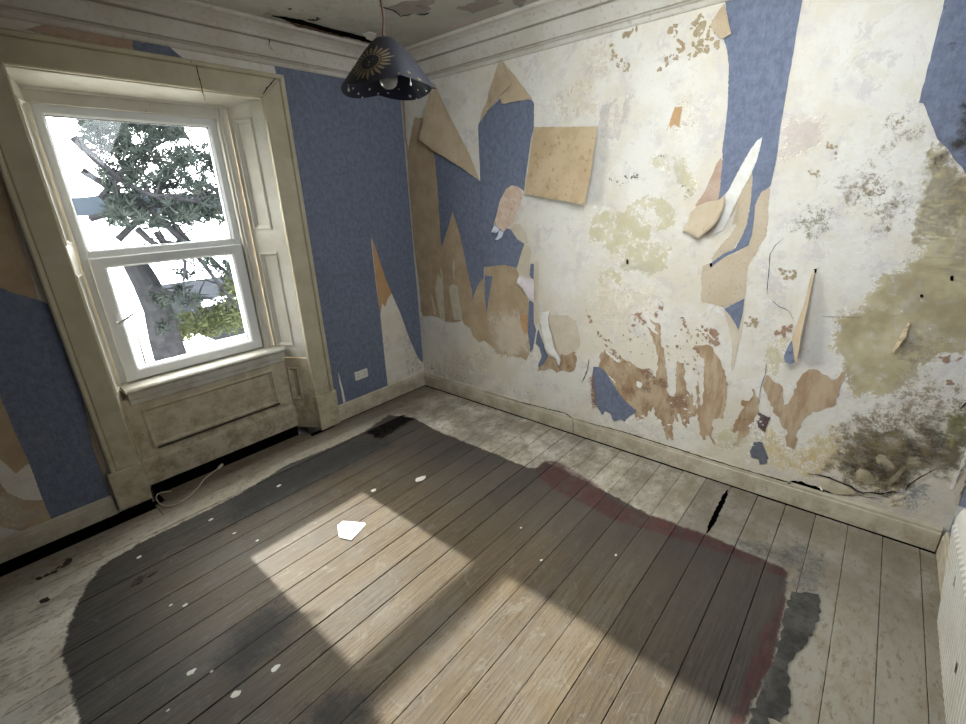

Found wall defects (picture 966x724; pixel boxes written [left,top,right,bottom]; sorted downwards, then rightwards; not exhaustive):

peeling [378,0,435,17]
peeling [449,0,526,30]
water stain [757,103,966,509]
peeling [586,301,720,381]
peeling [774,324,793,338]
flaking render [595,395,696,428]
peeling [746,415,786,464]
crack [808,467,940,498]